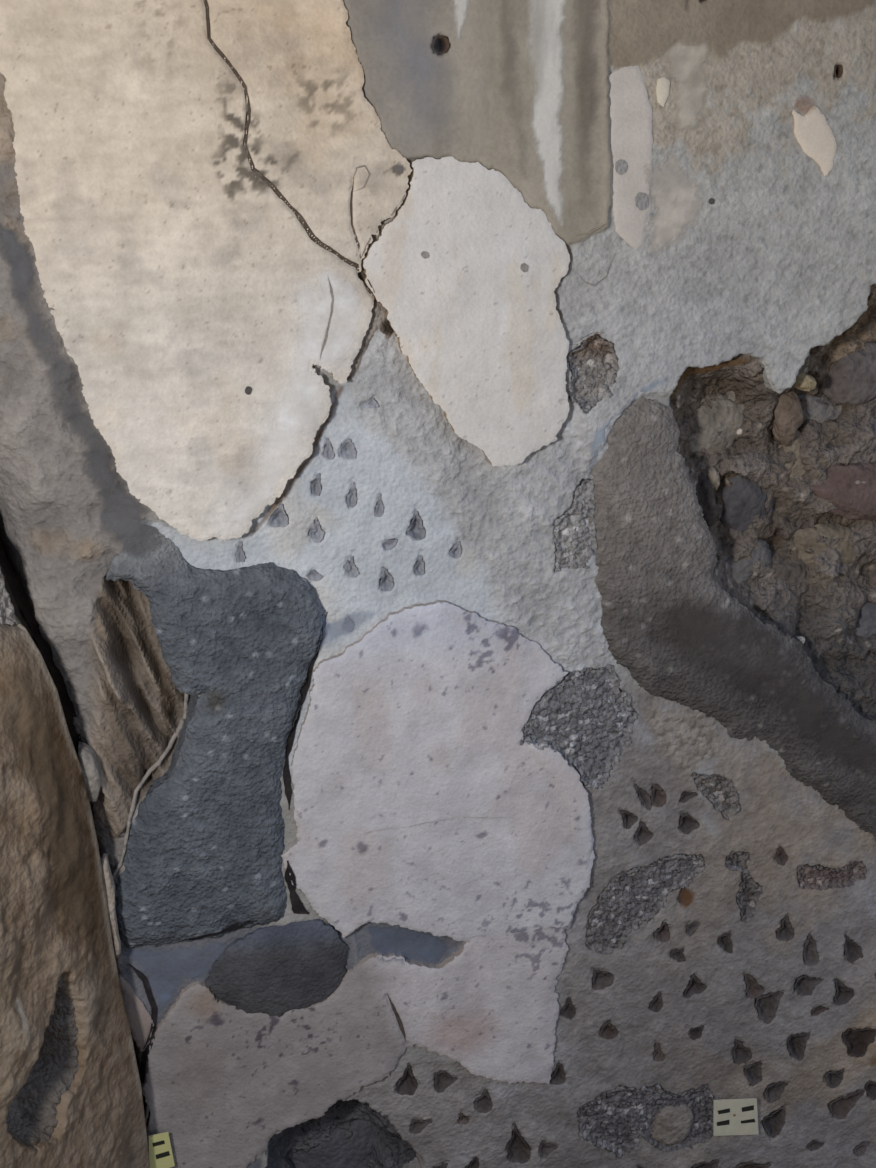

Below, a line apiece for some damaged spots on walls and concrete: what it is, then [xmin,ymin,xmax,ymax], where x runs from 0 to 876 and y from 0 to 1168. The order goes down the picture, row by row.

crack [203,0,411,380]
water stain [454,0,468,39]
water stain [528,0,566,219]
flaking render [669,284,876,716]